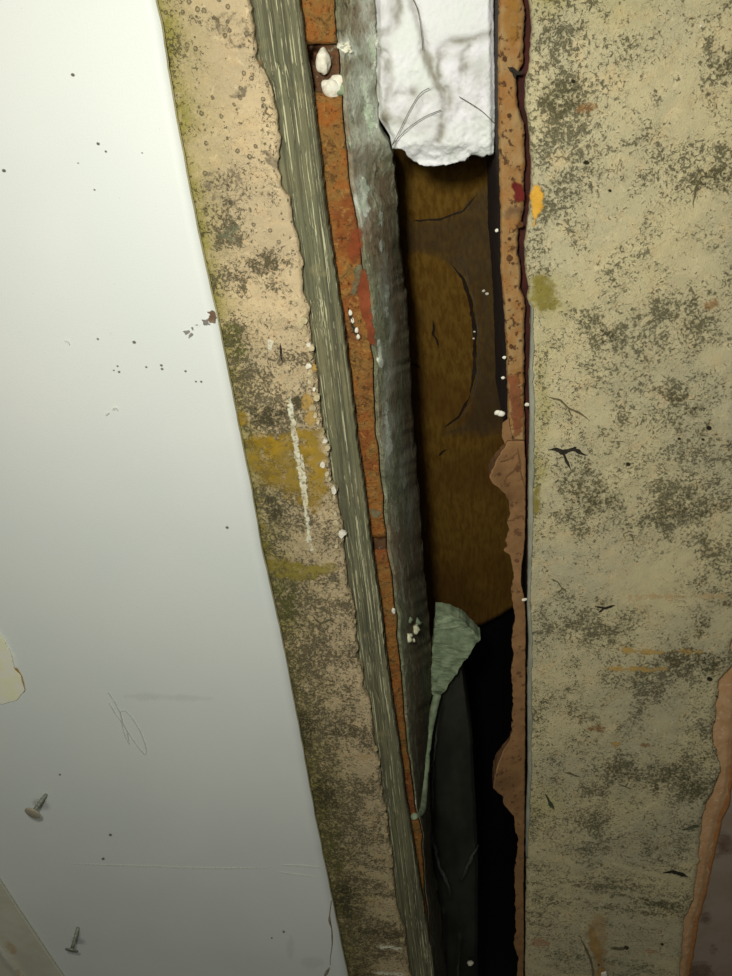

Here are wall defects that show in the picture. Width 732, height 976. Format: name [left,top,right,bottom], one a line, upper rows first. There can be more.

leakage [700,46,732,95]
leakage [533,79,584,124]
leakage [530,185,544,225]
leakage [683,167,732,199]
leakage [348,228,375,345]
leakage [238,393,328,551]
crack [550,447,586,469]
leakage [551,468,620,518]
peeling [407,617,422,643]
leakage [609,647,729,678]
leakage [299,713,317,749]
flaking render [680,666,732,976]